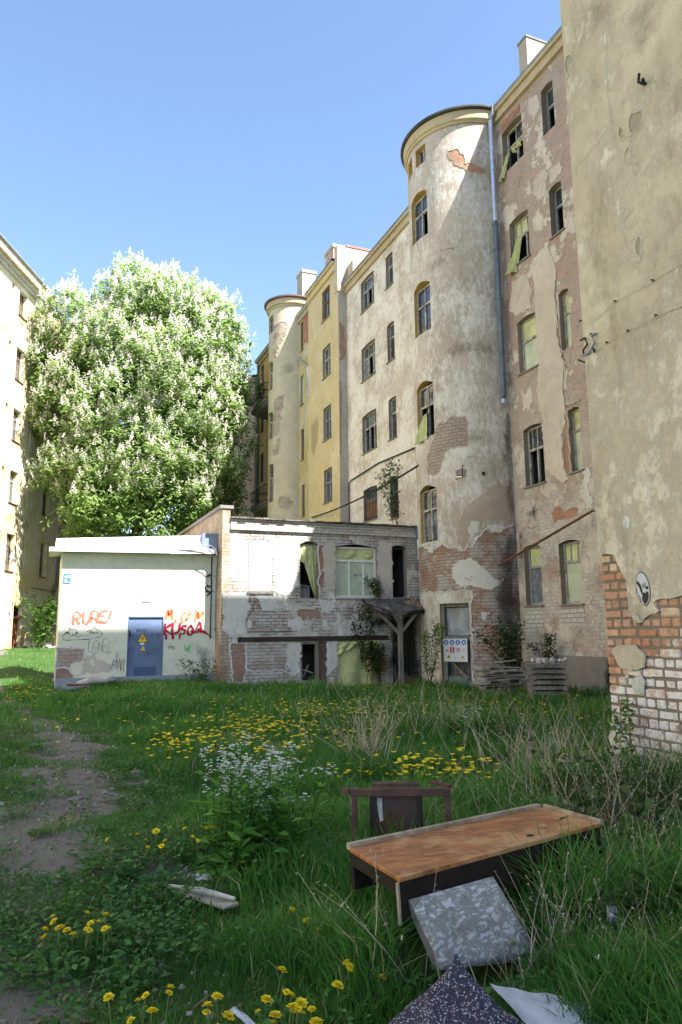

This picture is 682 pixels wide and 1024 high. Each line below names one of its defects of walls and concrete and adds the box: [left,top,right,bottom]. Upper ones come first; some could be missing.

flaking render [447,148,487,175]
flaking render [509,241,593,523]
flaking render [426,415,469,476]
flaking render [222,540,338,684]
flaking render [418,481,523,683]
flaking render [52,646,112,683]
flaking render [612,645,646,694]